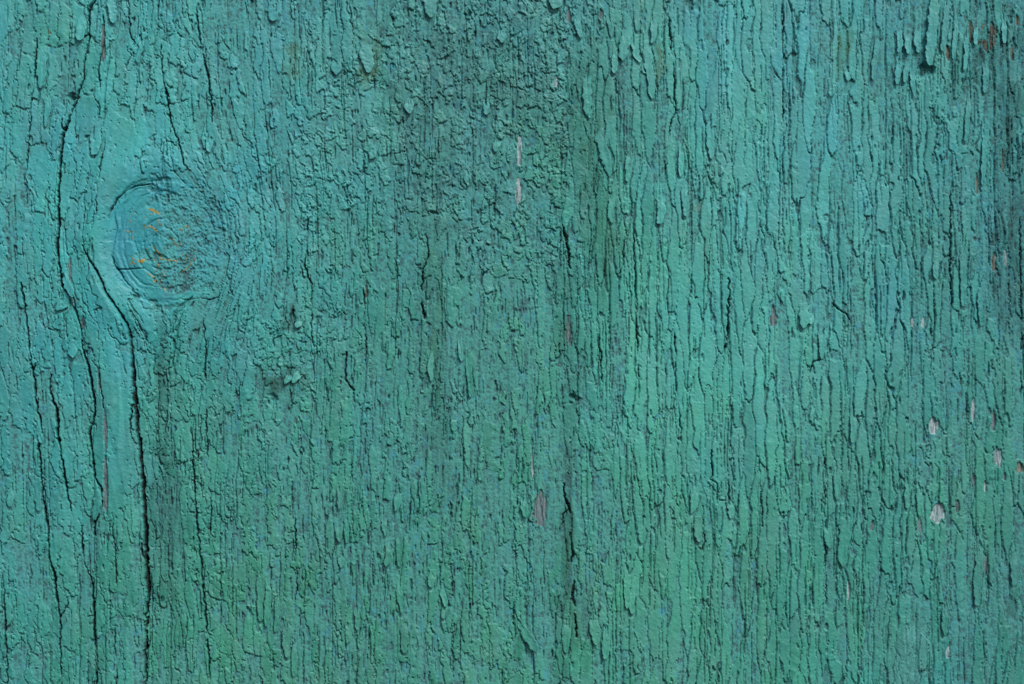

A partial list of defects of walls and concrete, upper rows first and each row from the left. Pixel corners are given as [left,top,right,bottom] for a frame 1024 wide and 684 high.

crack [56,91,80,313]
crack [562,232,570,266]
crack [21,286,69,623]
crack [82,355,114,549]
crack [97,261,151,655]
peeling [929,417,939,434]
peeling [520,490,547,526]
peeling [904,473,960,535]
crack [93,563,118,639]
crack [570,543,578,637]
peeling [973,524,987,606]